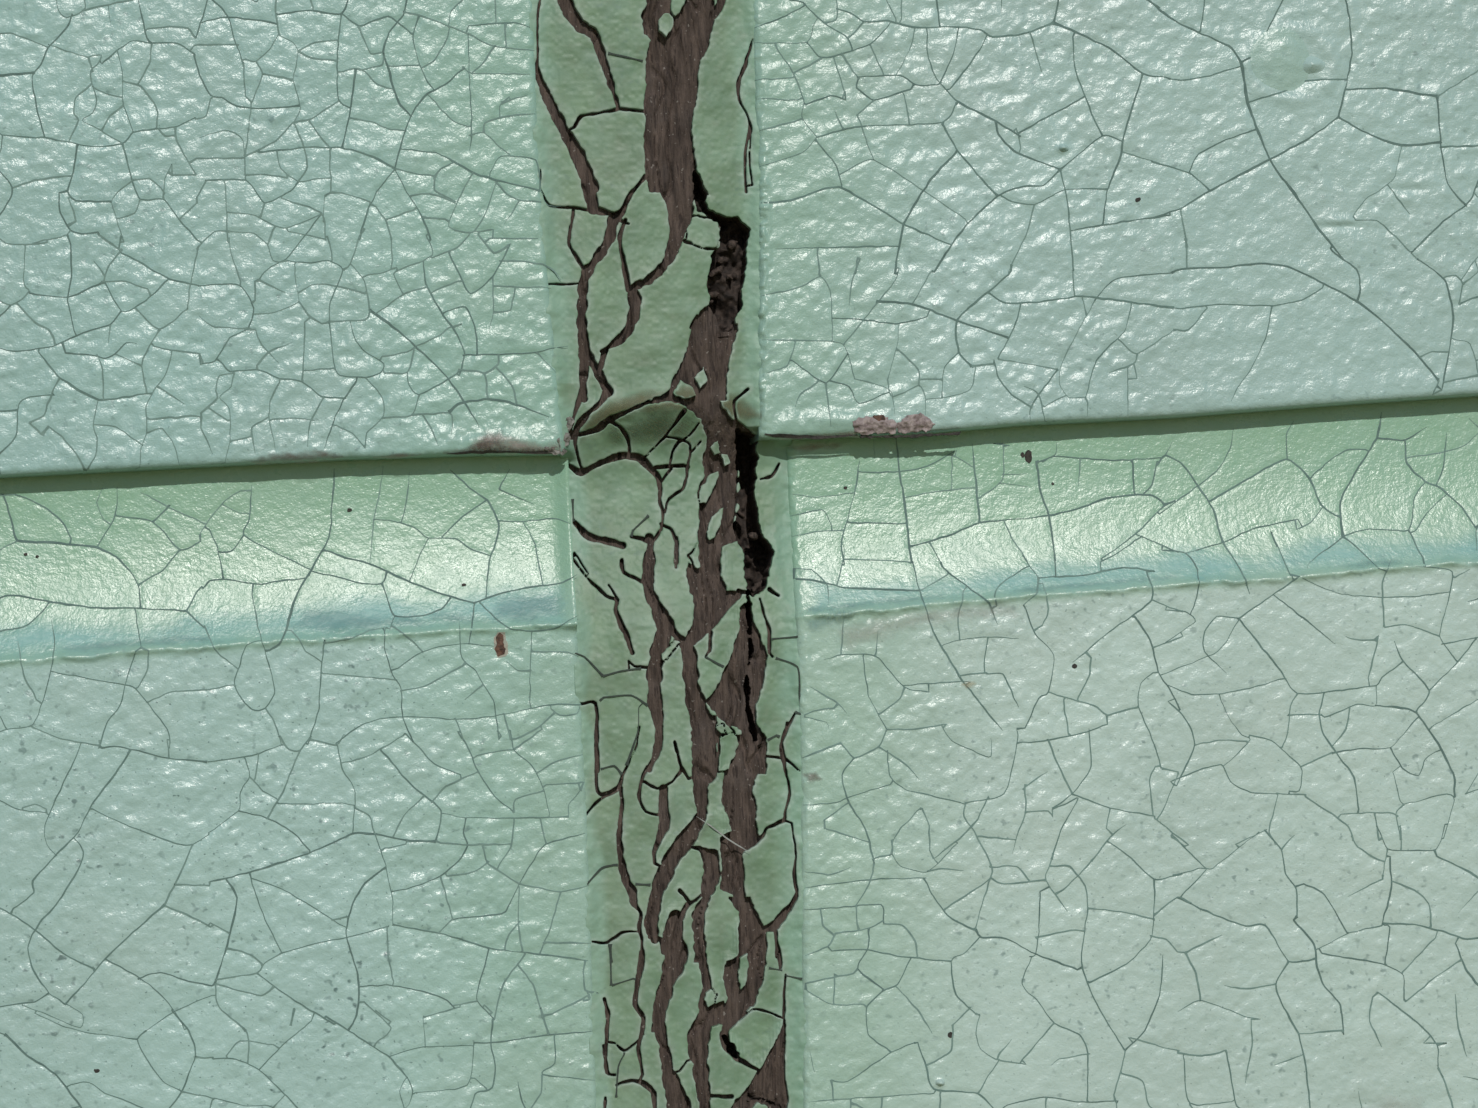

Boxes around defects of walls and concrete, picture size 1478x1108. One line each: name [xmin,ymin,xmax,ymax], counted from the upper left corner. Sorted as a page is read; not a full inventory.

crack [0,0,858,1108]
peeling [529,0,807,1108]
crack [736,0,1478,423]
crack [792,412,1478,1108]